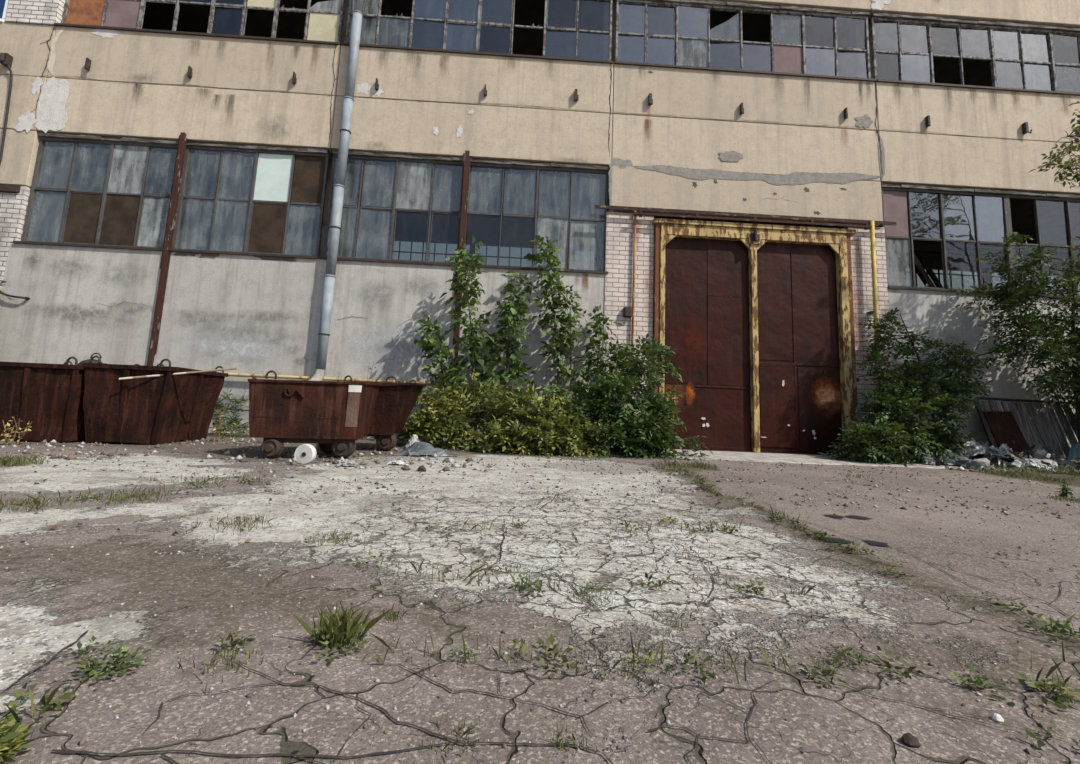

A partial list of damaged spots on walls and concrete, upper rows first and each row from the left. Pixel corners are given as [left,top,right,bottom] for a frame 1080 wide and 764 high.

peeling [870,0,891,10]
peeling [15,27,69,133]
corrosion [815,385,841,415]
crack [477,527,507,572]
crack [594,520,1079,621]
crack [4,630,89,691]
crack [51,660,613,764]
crack [647,670,1035,742]